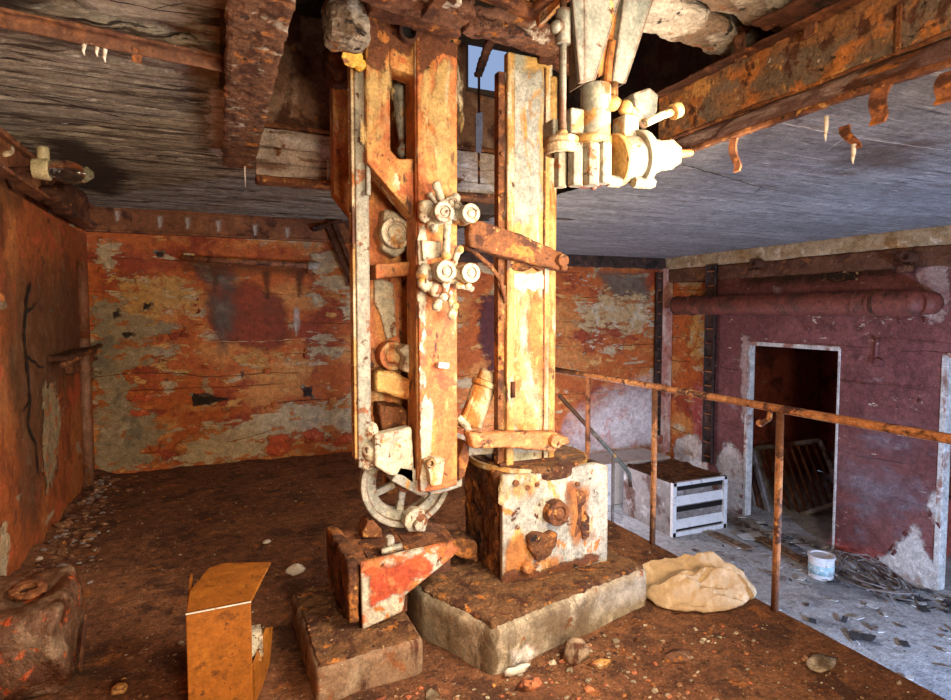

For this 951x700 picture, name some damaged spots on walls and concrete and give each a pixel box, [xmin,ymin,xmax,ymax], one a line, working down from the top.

peeling [306,251,350,320]
crack [23,282,46,474]
peeling [89,274,352,474]
peeling [716,442,745,512]
peeling [0,520,11,576]
peeling [868,527,938,589]